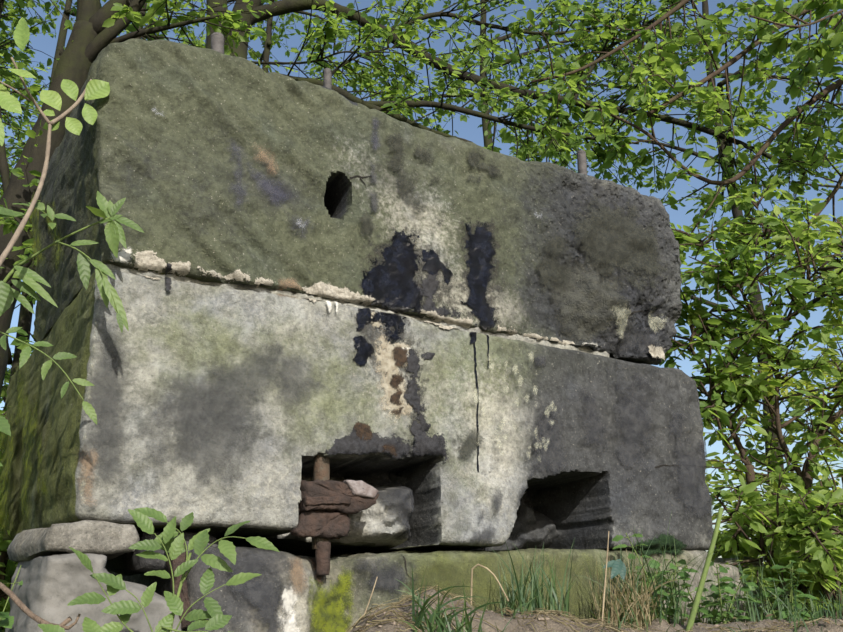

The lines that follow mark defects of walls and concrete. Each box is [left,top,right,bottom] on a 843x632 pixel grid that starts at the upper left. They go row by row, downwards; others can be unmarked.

spalling [112,249,381,327]
peeling [421,249,454,285]
damp [405,222,505,320]
spalling [420,309,473,330]
spalling [497,325,597,347]
peeling [375,336,412,417]
damp [353,308,435,437]
damp [470,330,489,432]
spalling [318,421,448,463]
spalling [457,429,483,458]
corrosion [309,556,327,585]